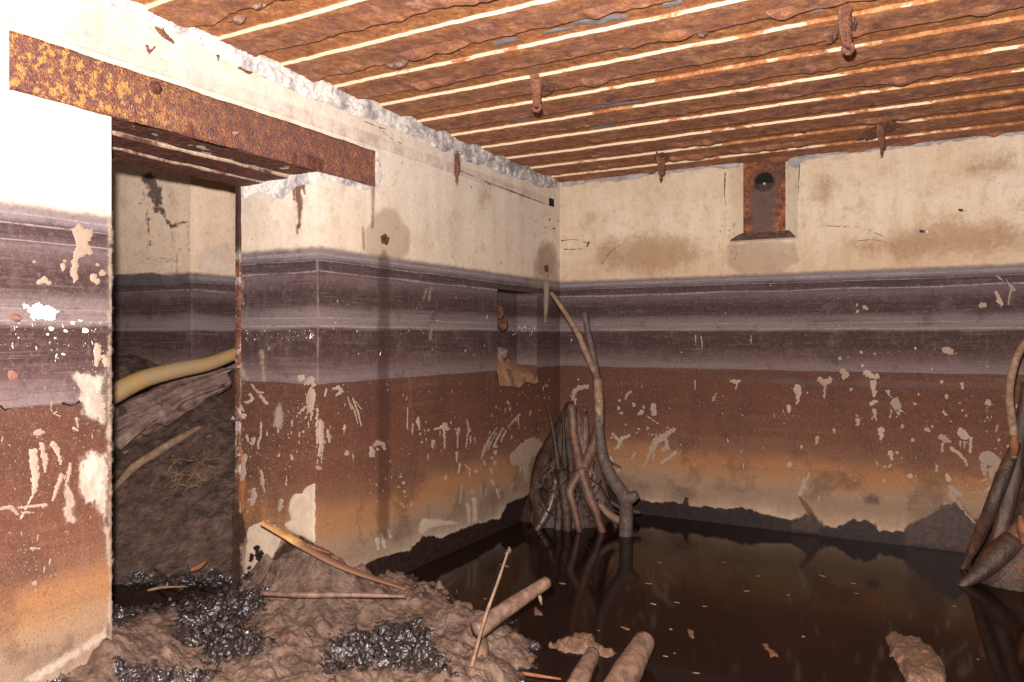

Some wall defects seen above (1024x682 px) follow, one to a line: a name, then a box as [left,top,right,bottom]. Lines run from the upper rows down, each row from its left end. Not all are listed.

rust [825,17,858,46]
peeling [94,0,739,207]
rust [528,77,555,97]
rust [855,120,902,141]
rust [292,185,305,234]
peeling [60,218,112,289]
peeling [73,336,111,466]
damp [231,499,315,582]
peeling [245,484,316,571]
damp [366,495,528,577]
damp [633,497,993,554]